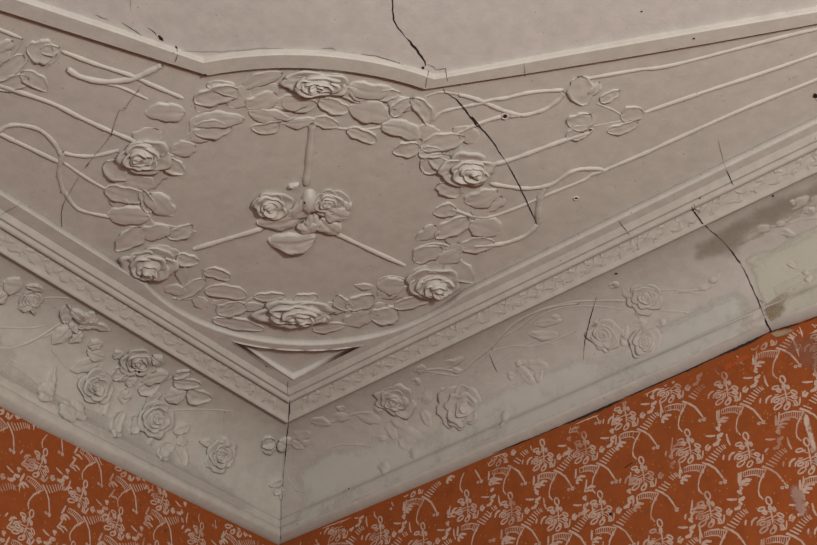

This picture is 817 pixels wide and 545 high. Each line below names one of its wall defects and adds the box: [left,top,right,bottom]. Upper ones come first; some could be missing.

crack [97,0,273,61]
crack [392,0,537,224]
crack [493,205,817,454]